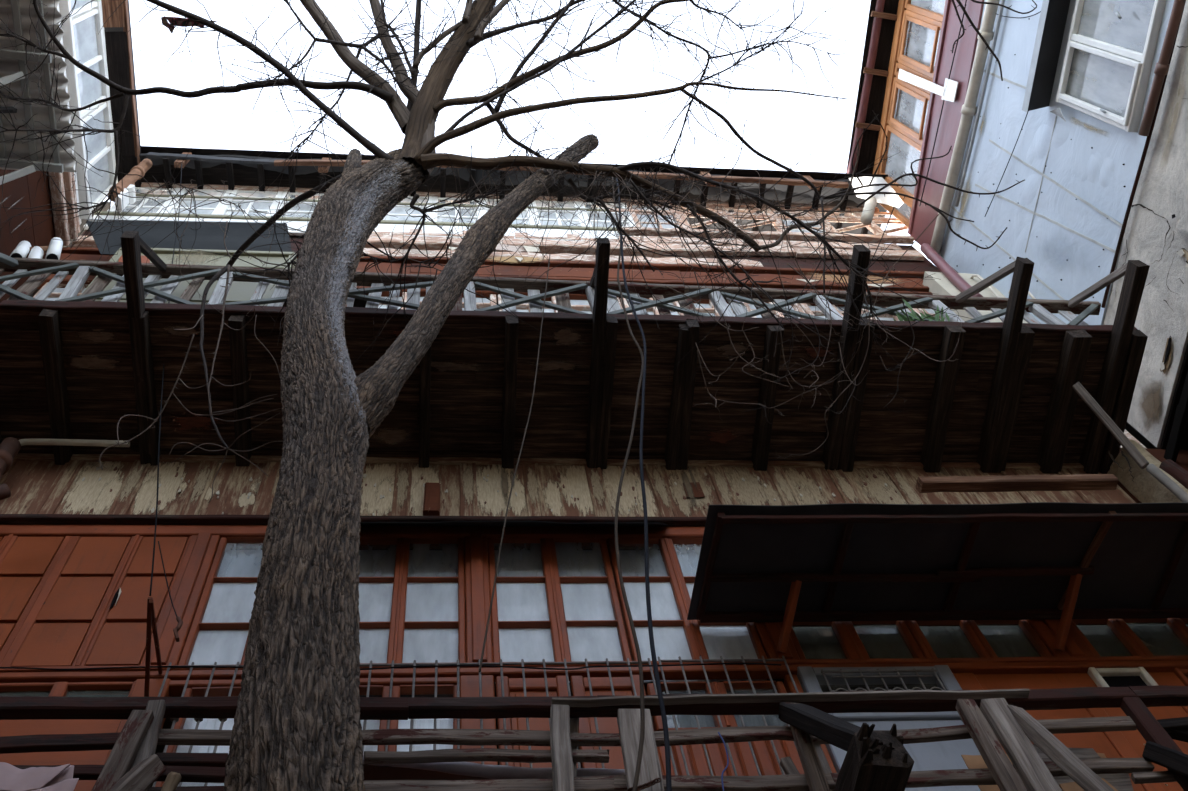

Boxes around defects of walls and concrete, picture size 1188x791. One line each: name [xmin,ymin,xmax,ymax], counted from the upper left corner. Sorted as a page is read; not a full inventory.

crack [1132,204,1184,306]
peeling [62,461,261,515]
peeling [360,464,448,516]
peeling [462,465,921,517]